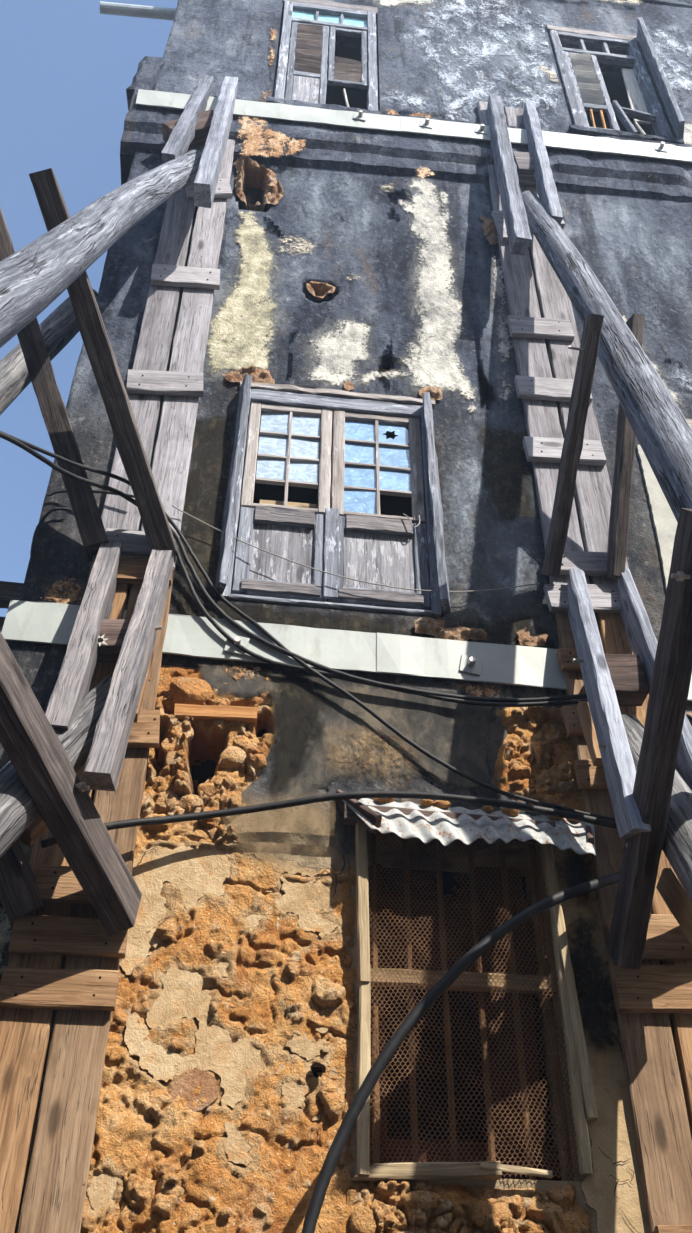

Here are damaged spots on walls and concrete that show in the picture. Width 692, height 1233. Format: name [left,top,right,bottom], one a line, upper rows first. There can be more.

peeling [207,116,317,384]
peeling [305,167,476,412]
spalling [80,662,650,1233]
water stain [561,850,592,899]
water stain [568,917,624,1057]
crack [598,1147,641,1233]